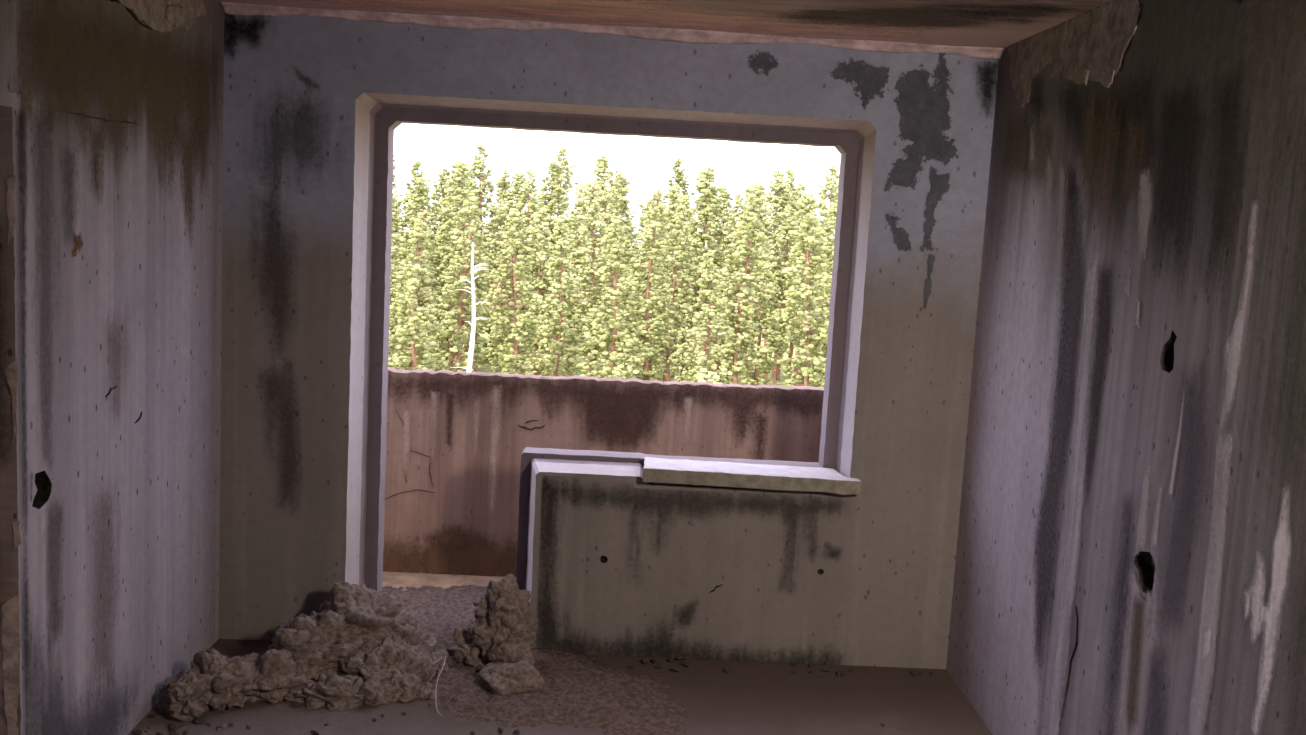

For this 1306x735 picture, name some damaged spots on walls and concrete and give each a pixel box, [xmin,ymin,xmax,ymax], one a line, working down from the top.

crack [107,0,152,30]
damp [979,61,999,110]
flaking render [1008,0,1141,107]
damp [18,0,266,433]
peeling [831,53,958,308]
flaking render [1,111,52,735]
damp [388,375,824,509]
damp [1030,75,1255,735]
hole [1160,330,1177,373]
crack [1058,606,1079,735]
hole [1134,551,1157,594]
efflorescence [1245,493,1290,732]